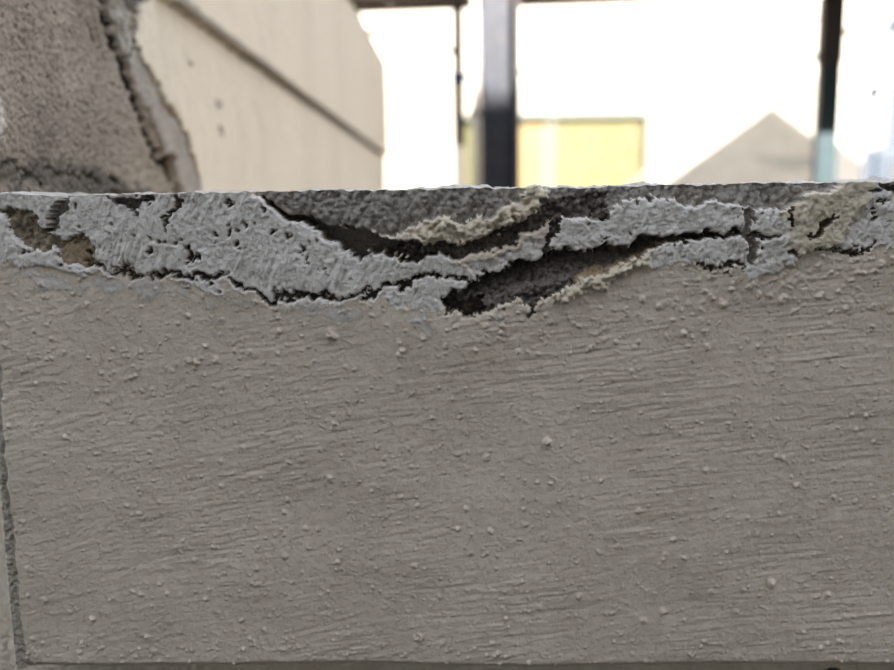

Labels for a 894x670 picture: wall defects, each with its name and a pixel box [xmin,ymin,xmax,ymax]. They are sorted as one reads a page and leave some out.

crack [0,135,141,194]
crack [80,0,176,193]
peeling [0,0,894,319]
crack [85,249,487,318]